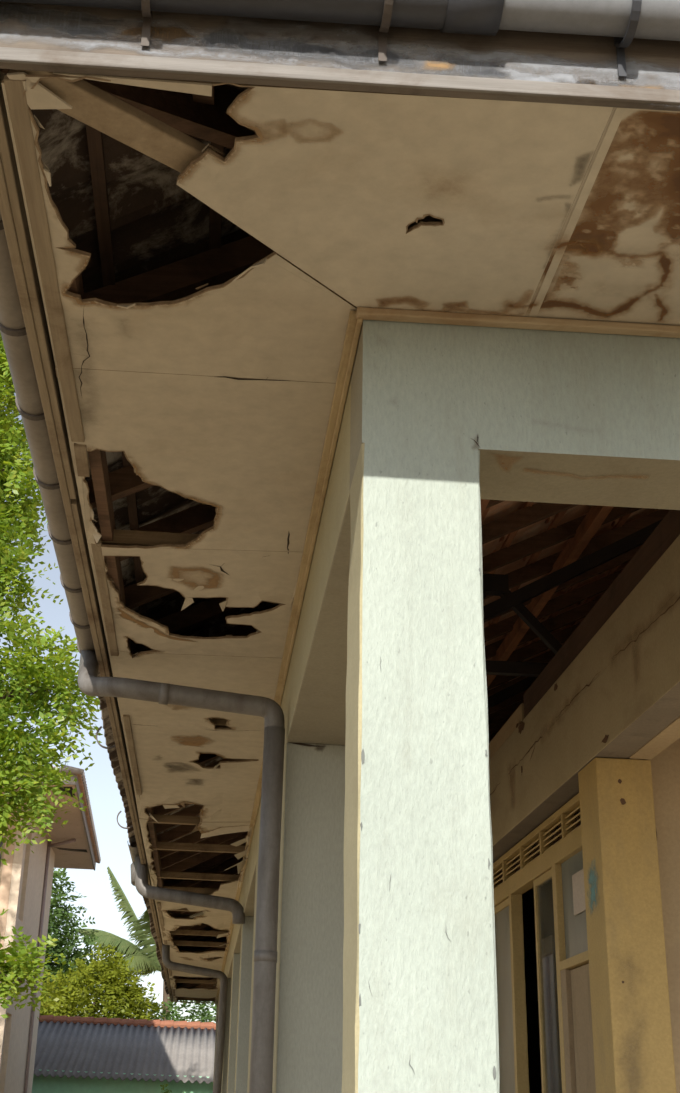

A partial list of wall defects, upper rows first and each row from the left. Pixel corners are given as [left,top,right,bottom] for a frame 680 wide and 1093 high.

leakage [442,111,680,321]
peeling [232,258,267,282]
leakage [380,298,421,306]
crack [72,310,90,396]
crack [224,375,285,383]
peeling [90,509,102,543]
leakage [171,567,221,589]
crack [490,596,680,795]
peeling [191,824,250,874]